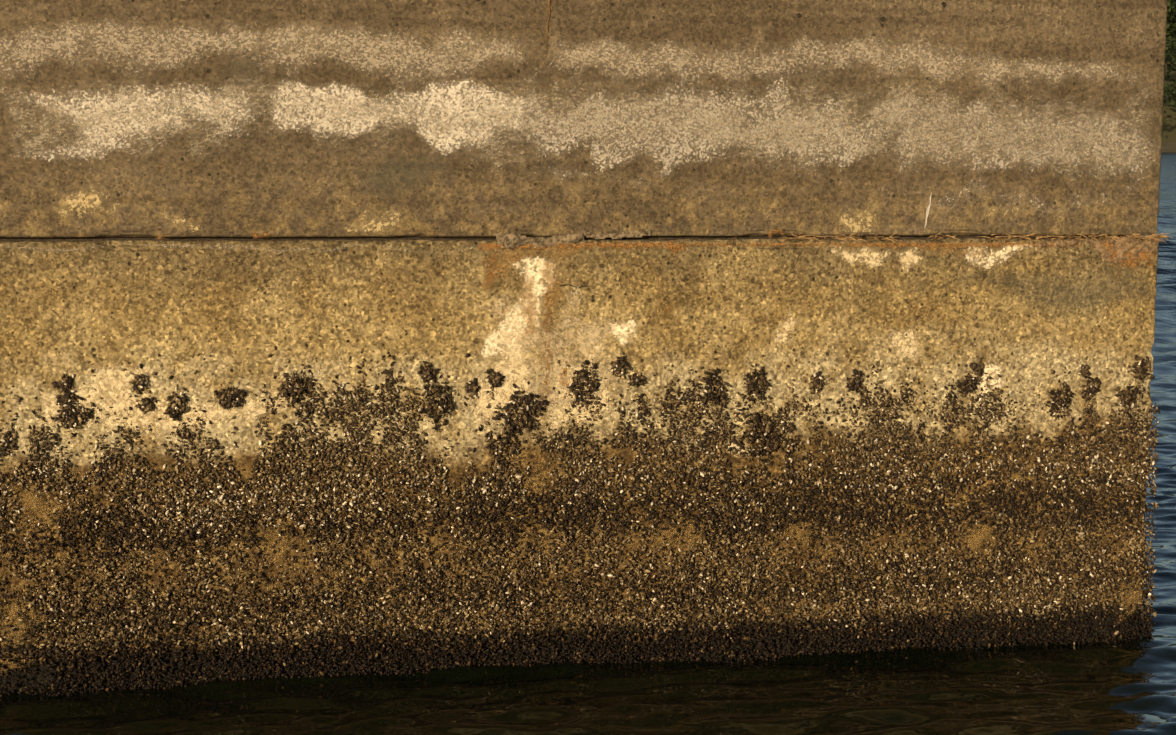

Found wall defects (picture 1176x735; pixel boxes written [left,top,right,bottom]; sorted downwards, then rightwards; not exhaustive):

damp [0,23,1118,169]
damp [466,256,636,428]
corrosion [479,229,1053,421]